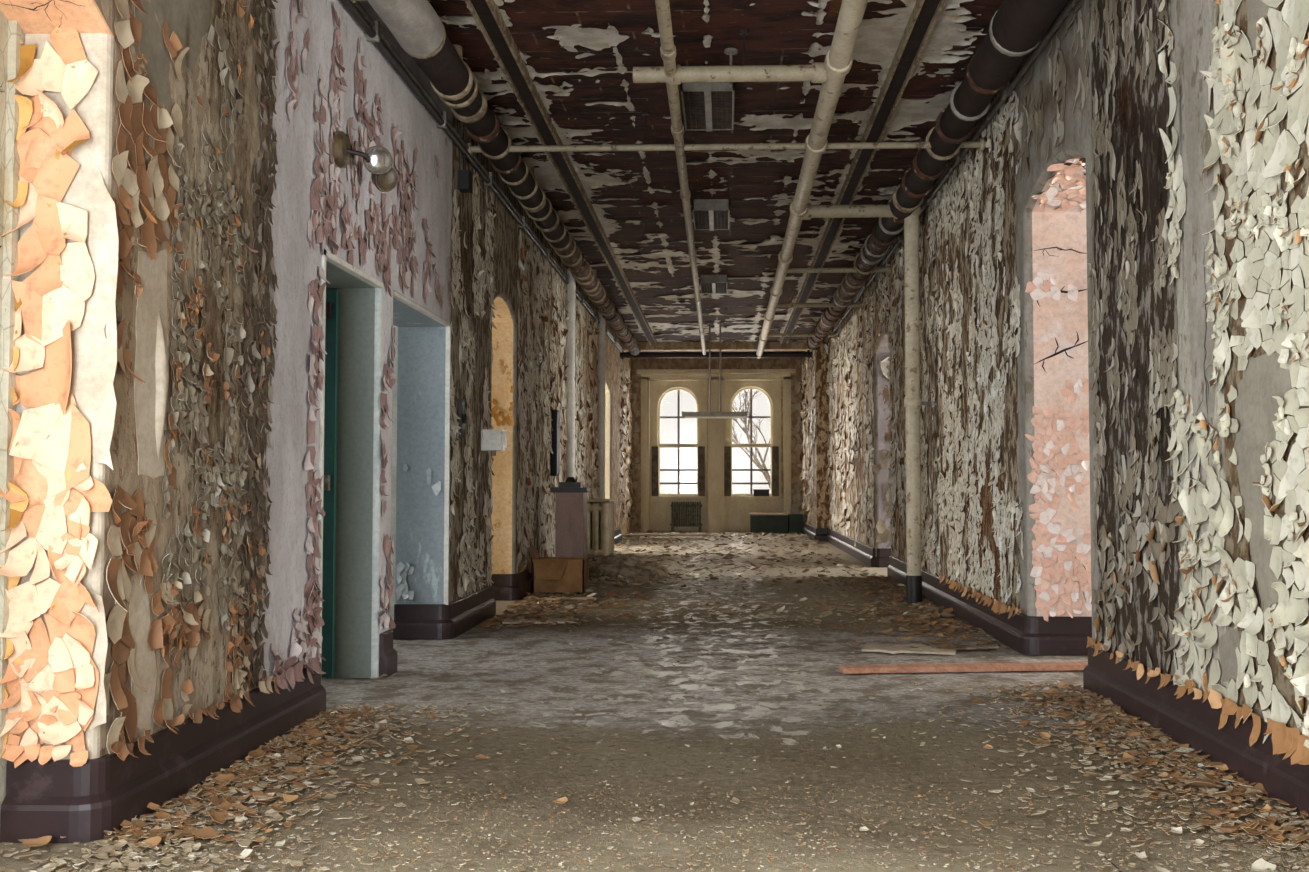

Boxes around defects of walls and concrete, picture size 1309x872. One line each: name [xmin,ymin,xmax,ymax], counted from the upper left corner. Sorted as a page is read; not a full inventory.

crack [2,0,81,28]
crack [1034,247,1087,306]
crack [1033,331,1088,372]
flaking render [462,0,1309,765]